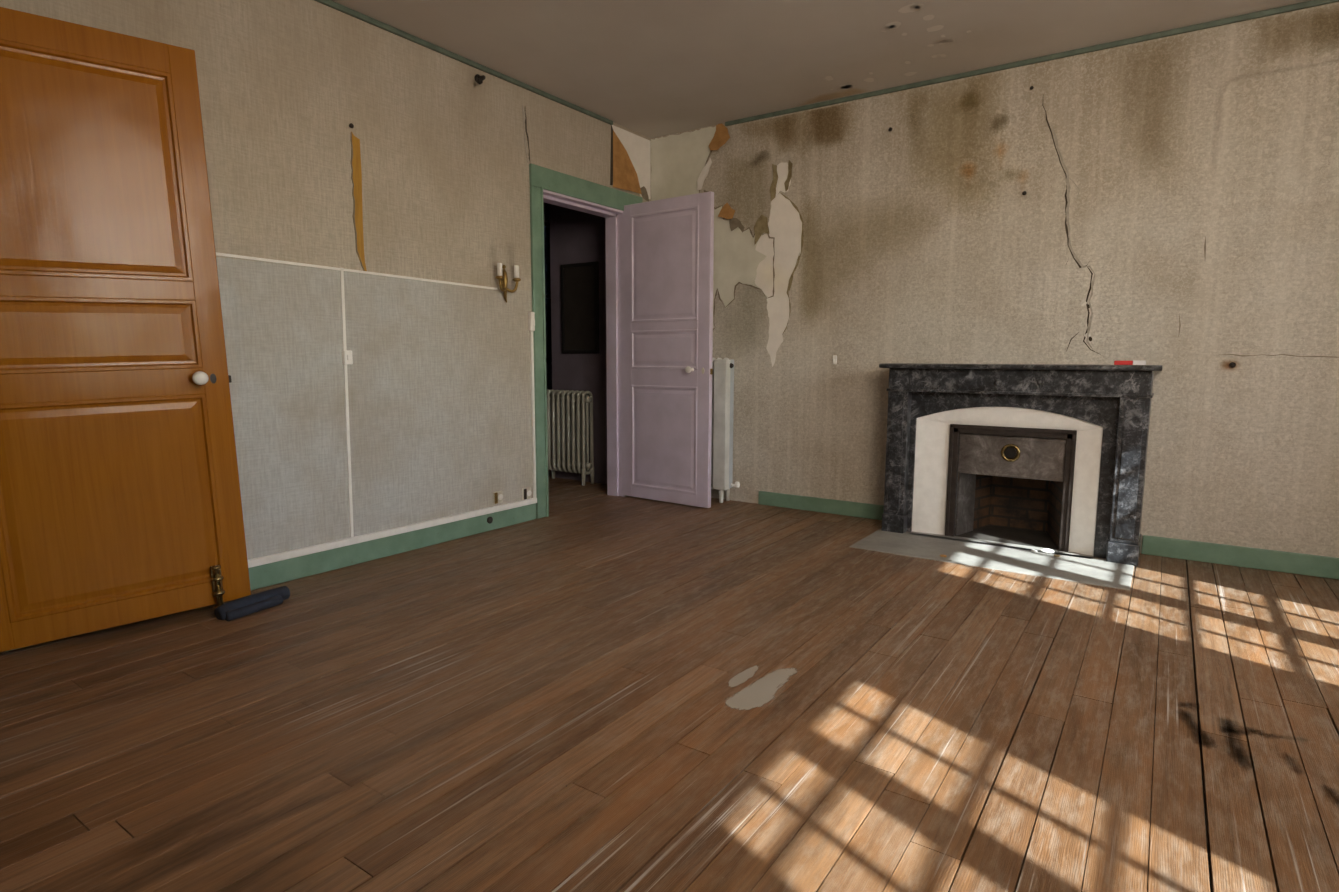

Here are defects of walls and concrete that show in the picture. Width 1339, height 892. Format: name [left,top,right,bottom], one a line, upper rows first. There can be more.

flaking render [612,125,716,201]
flaking render [713,206,767,328]
crack [1042,104,1101,355]